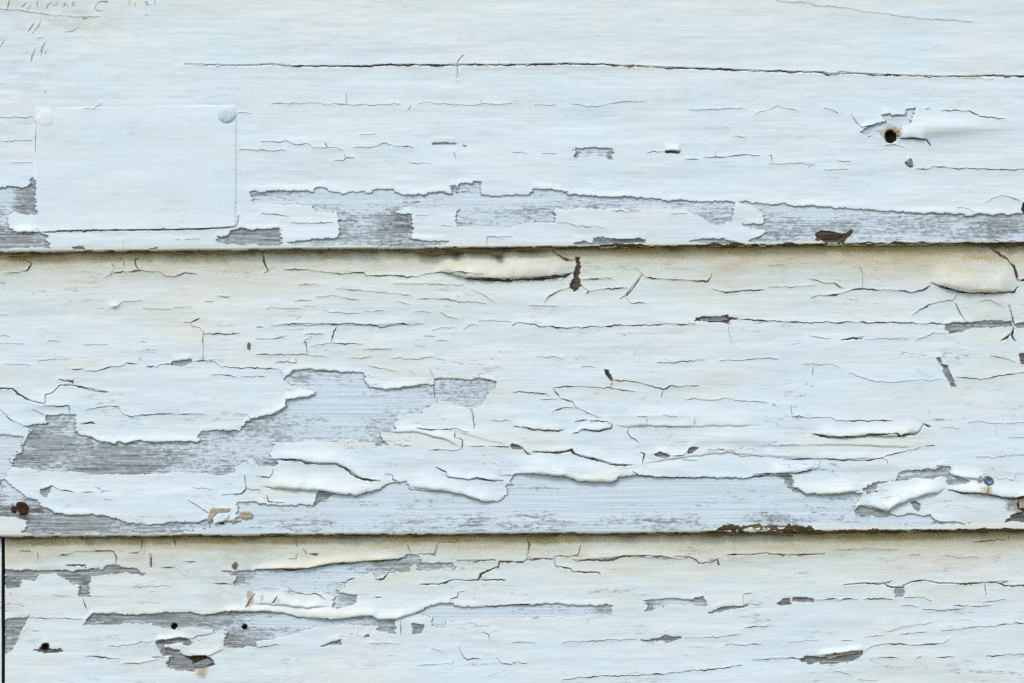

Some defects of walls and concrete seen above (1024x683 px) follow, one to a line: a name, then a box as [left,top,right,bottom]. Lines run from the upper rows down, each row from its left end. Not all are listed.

crack [185,59,1024,80]
crack [827,108,1019,171]
peeling [0,179,50,250]
peeling [216,182,1024,247]
crack [0,335,199,424]
crack [110,248,1024,500]
peeling [0,369,985,534]
peeling [5,565,144,597]
peeling [85,555,612,671]
crack [246,539,918,665]
spalling [800,651,862,664]
crack [824,536,1024,681]